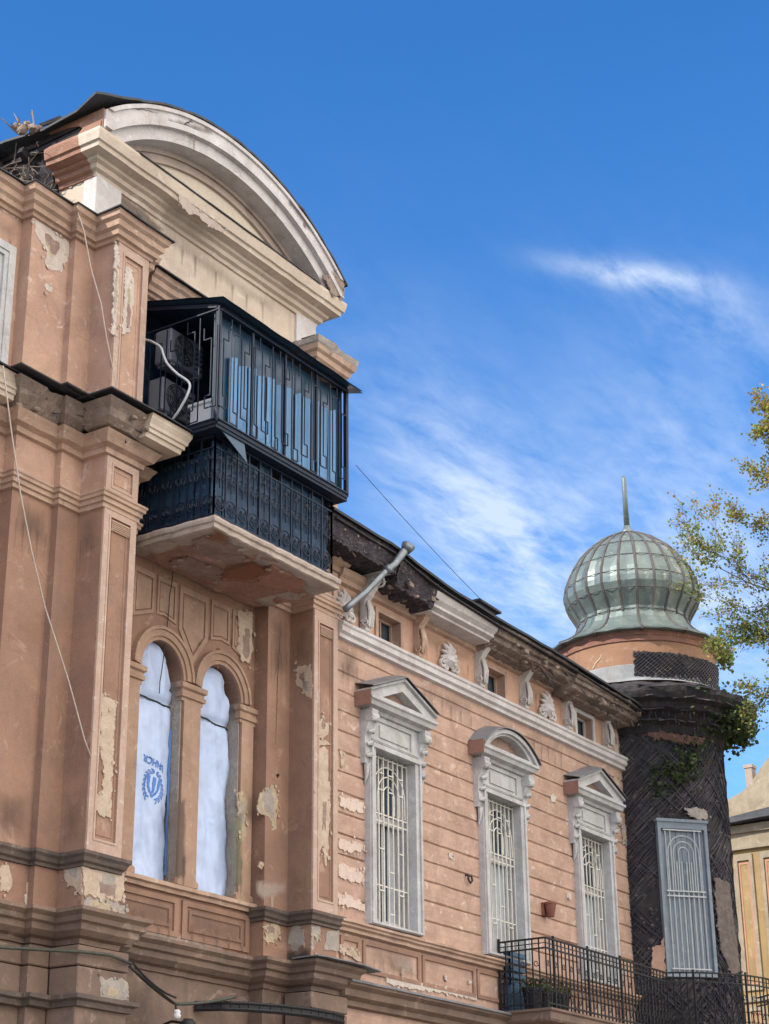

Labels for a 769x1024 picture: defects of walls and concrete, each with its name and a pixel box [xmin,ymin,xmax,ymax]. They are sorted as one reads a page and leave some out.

peeling [0,208,70,295]
peeling [109,241,135,336]
spalling [257,564,306,596]
peeling [236,609,257,669]
peeling [293,660,313,699]
peeling [96,692,118,821]
peeling [234,784,281,845]
peeling [314,712,367,919]
peeling [0,862,13,897]
peeling [62,866,129,914]
peeling [261,923,361,961]
peeling [99,973,130,1001]